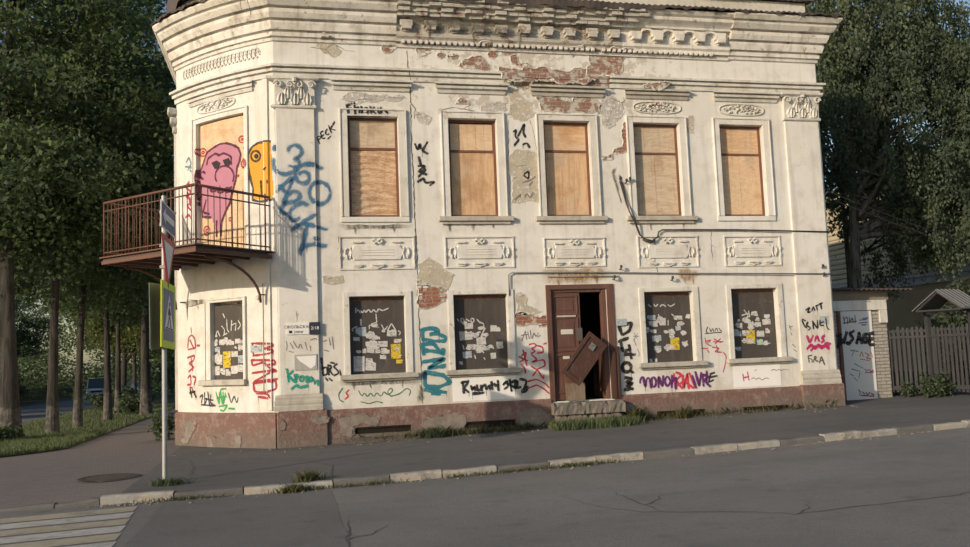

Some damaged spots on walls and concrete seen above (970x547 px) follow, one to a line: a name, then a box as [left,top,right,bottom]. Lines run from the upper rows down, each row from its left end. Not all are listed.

spalling [413,40,634,161]
peeling [507,149,539,204]
peeling [415,257,454,310]
spalling [514,292,547,328]
peeling [180,418,242,448]
peeling [311,412,381,438]